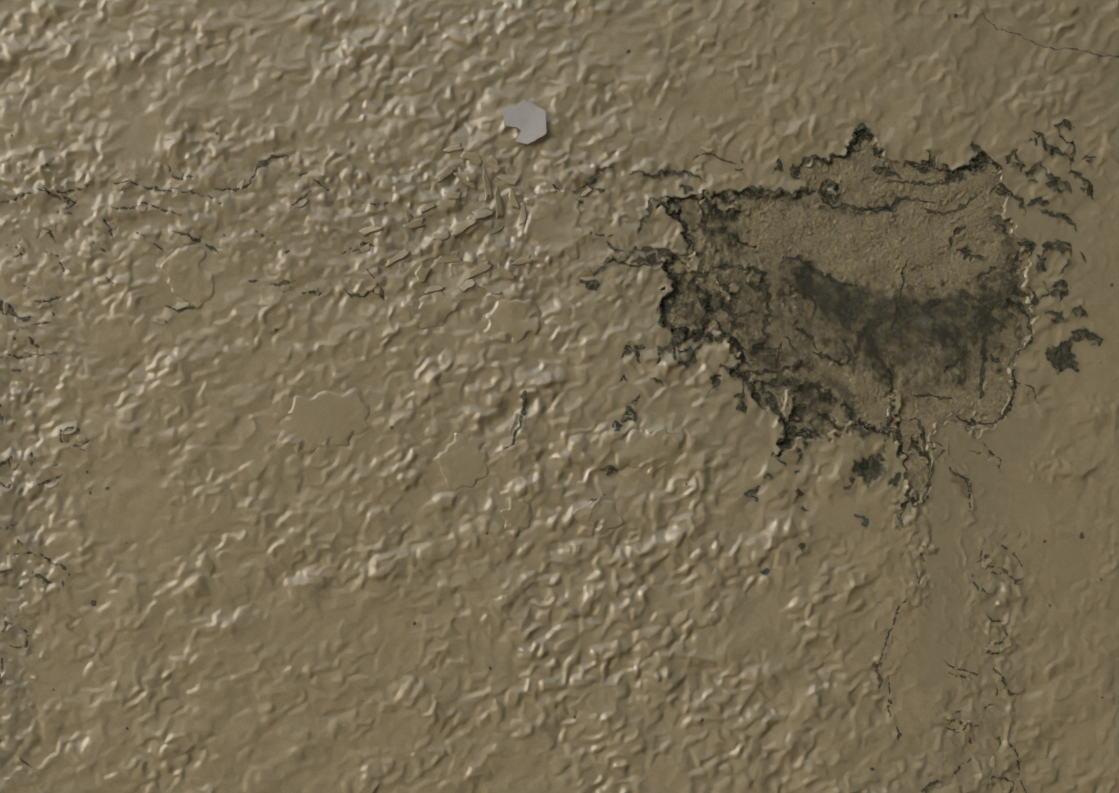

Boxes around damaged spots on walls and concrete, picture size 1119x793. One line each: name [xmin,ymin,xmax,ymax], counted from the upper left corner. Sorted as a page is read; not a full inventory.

crack [0,155,330,372]
crack [249,242,385,299]
peeling [576,119,1103,510]
leakage [776,258,1026,385]
crack [0,427,89,488]
crack [0,525,70,684]
crack [873,553,927,739]
crack [921,545,1027,793]